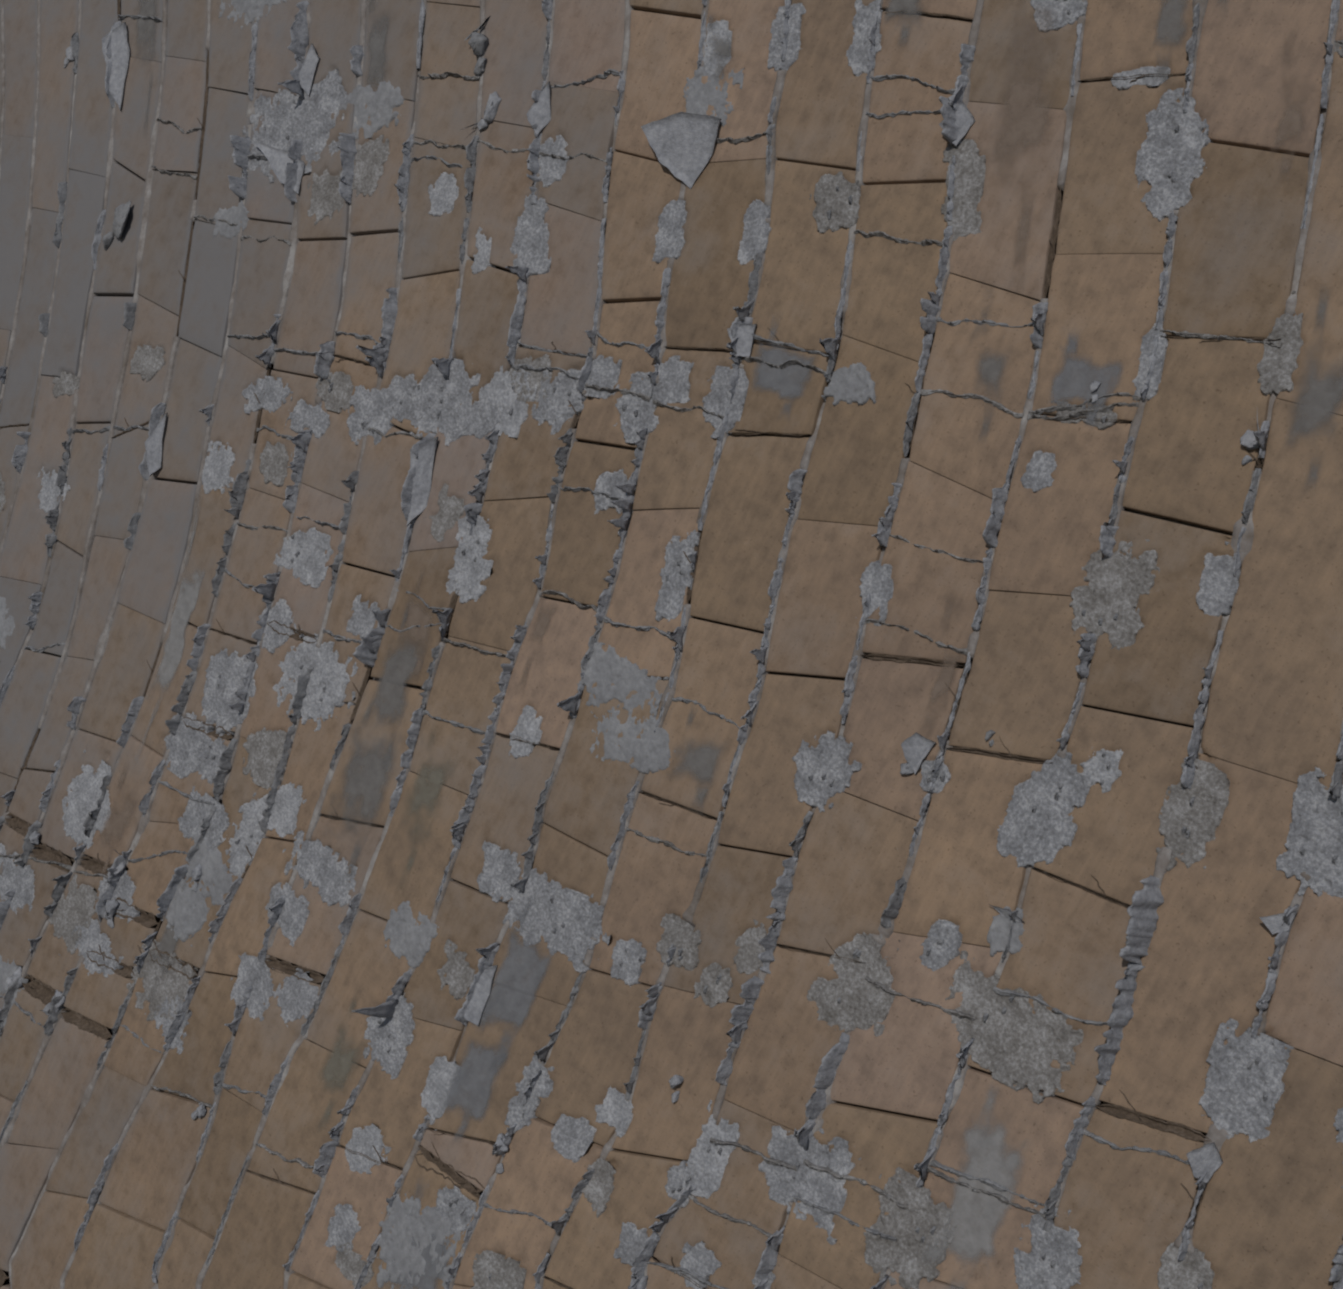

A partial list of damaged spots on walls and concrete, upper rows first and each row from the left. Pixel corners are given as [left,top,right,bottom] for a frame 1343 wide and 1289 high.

spalling [1109,66,1213,232]
crack [1044,189,1063,298]
spalling [161,301,757,947]
crack [860,653,1052,764]
crack [5,729,198,993]
spalling [477,800,780,1016]
spalling [996,734,1123,874]
crack [23,975,113,1040]
crack [338,1128,495,1199]
spalling [613,1099,957,1289]
crack [1095,1089,1212,1142]
spalling [1172,1018,1298,1190]